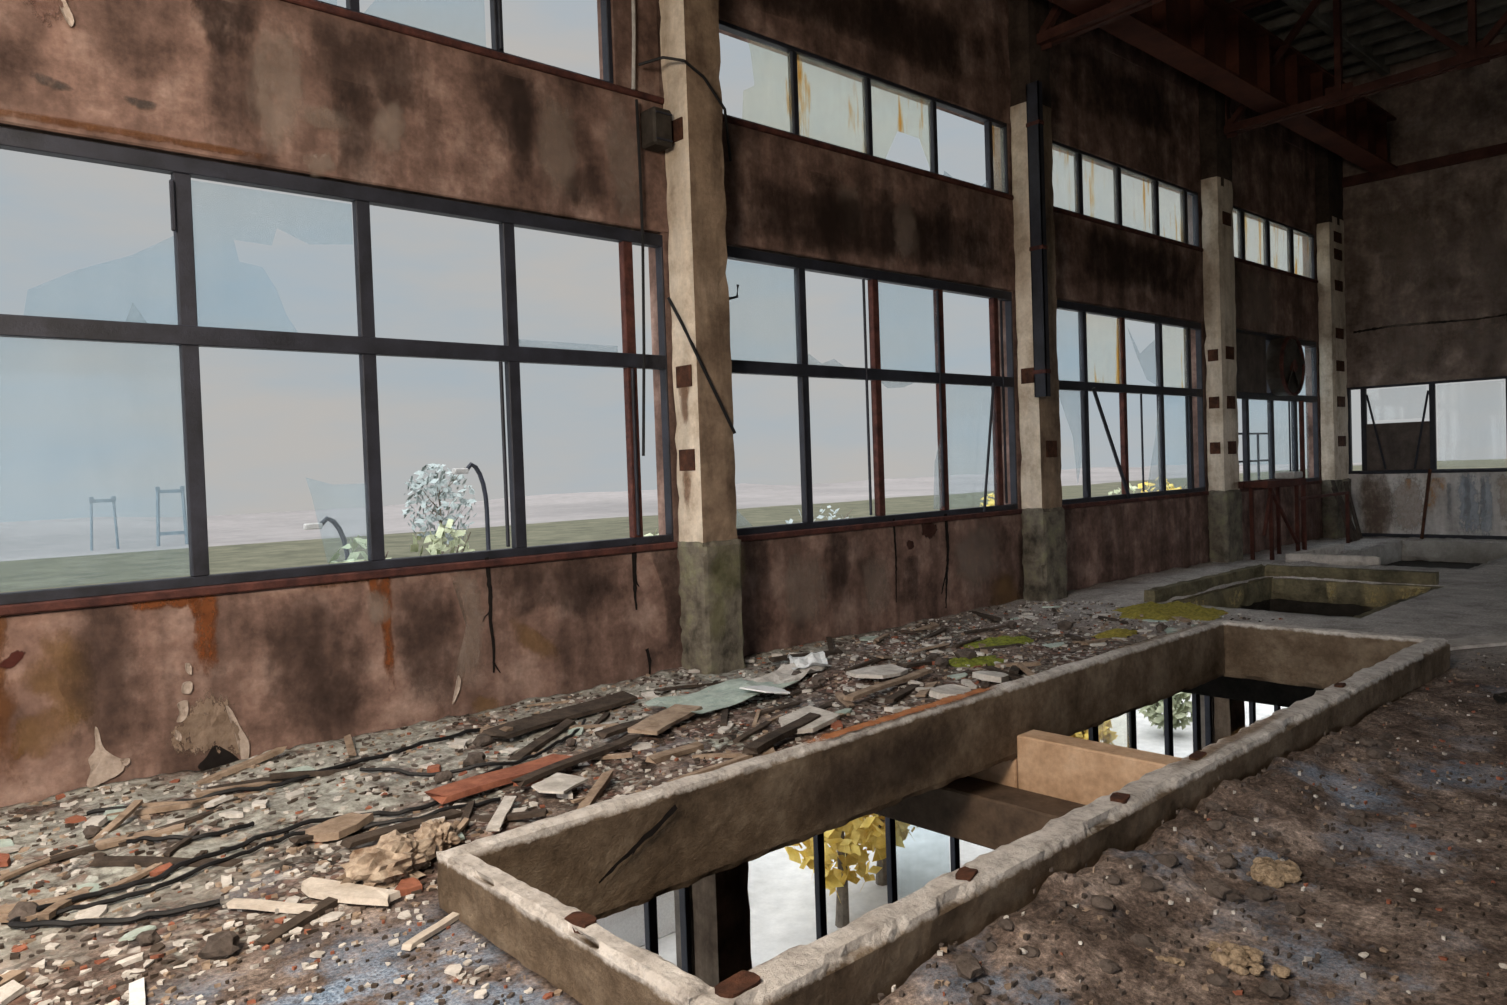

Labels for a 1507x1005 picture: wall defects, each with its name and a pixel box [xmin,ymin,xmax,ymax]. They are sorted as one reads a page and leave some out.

rust [132,595,218,666]
rust [320,577,394,672]
spalling [171,663,250,771]
peeling [86,727,130,788]
crack [599,805,678,884]